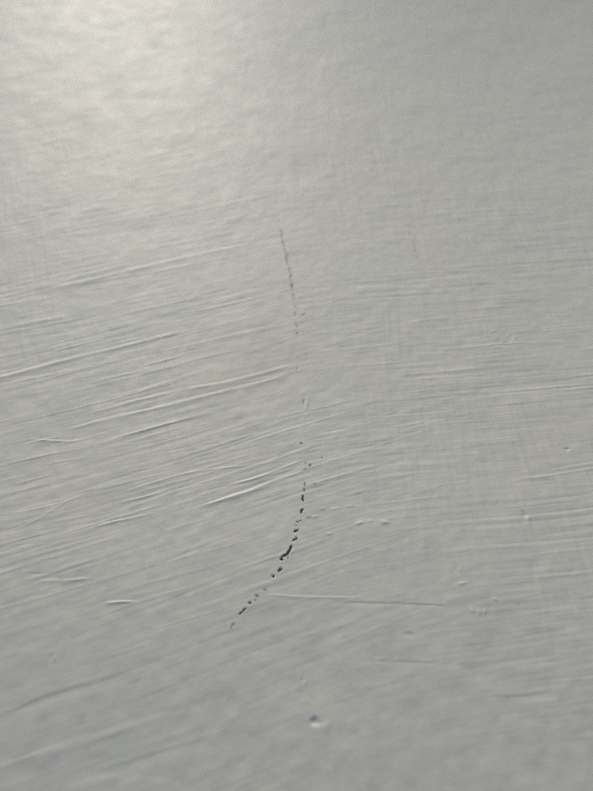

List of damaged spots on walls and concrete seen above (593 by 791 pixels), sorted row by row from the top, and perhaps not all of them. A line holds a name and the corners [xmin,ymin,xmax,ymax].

crack [278,219,306,368]
crack [230,400,323,629]